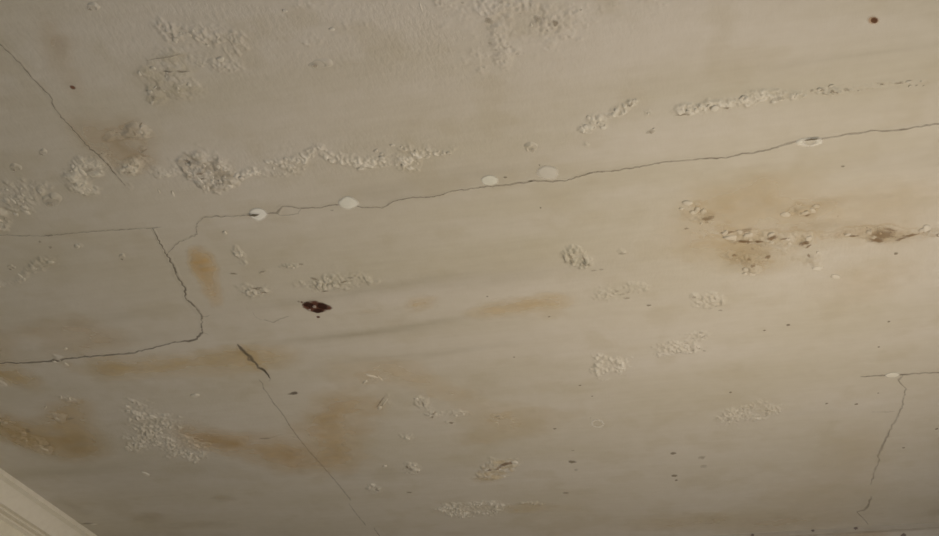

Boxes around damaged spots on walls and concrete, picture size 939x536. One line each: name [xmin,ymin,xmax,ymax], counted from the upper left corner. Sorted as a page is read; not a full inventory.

peeling [166,142,242,196]
crack [264,120,939,218]
crack [0,227,206,366]
corrosion [301,301,332,318]
crack [236,343,272,379]